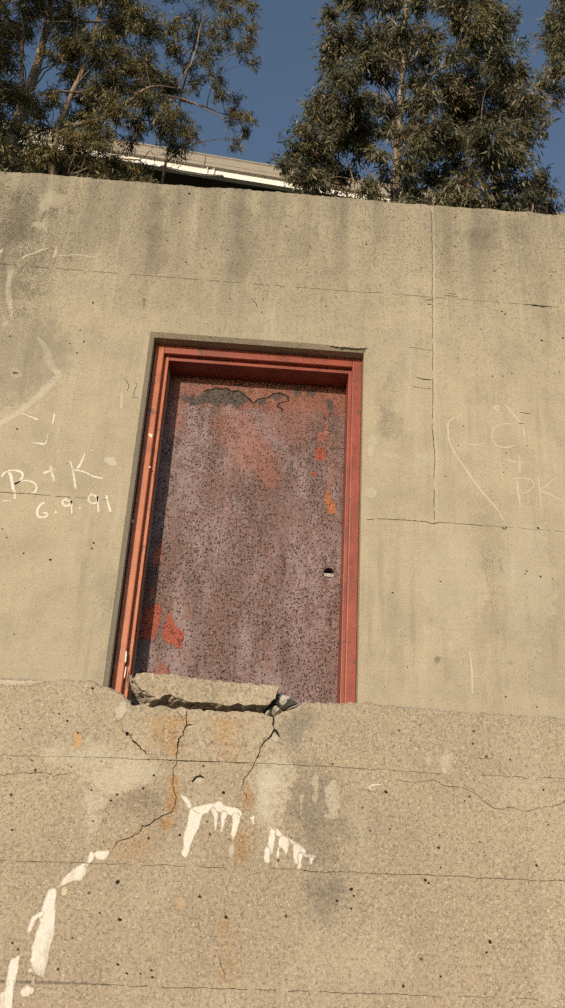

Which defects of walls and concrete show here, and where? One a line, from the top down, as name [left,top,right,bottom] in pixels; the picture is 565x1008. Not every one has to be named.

corrosion [163,393,190,441]
corrosion [202,393,330,500]
crack [112,711,193,849]
crack [241,715,282,798]